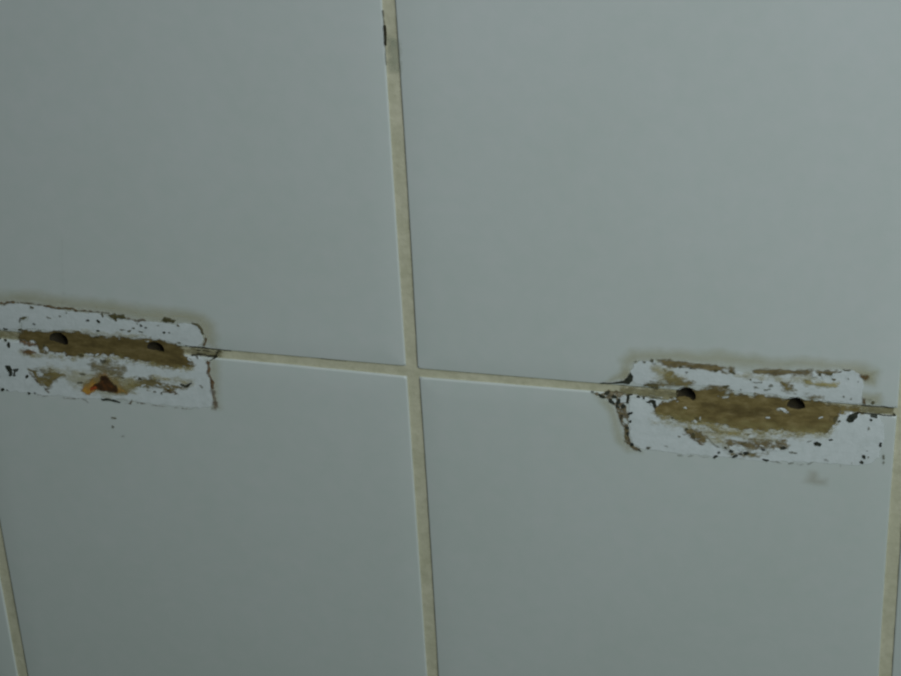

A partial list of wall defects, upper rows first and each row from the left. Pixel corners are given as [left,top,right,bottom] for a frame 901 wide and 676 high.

rust [82,372,128,394]
peeling [0,303,213,409]
peeling [594,360,884,465]